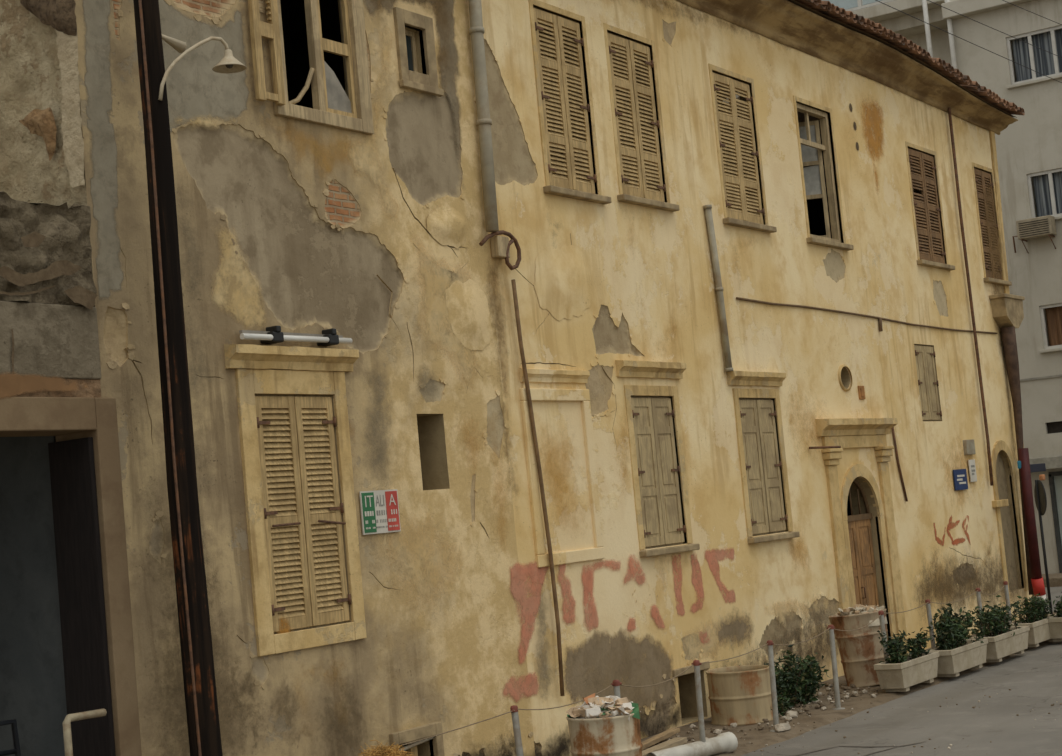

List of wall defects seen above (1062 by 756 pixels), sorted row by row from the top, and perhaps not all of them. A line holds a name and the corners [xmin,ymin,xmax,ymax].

flaking render [164,0,236,24]
peeling [19,0,85,187]
spalling [350,32,465,214]
spalling [474,39,537,185]
peeling [0,260,97,310]
spalling [172,118,410,354]
spalling [584,305,643,421]
leakage [920,563,1014,605]
leakage [537,733,572,756]
leakage [640,707,679,737]